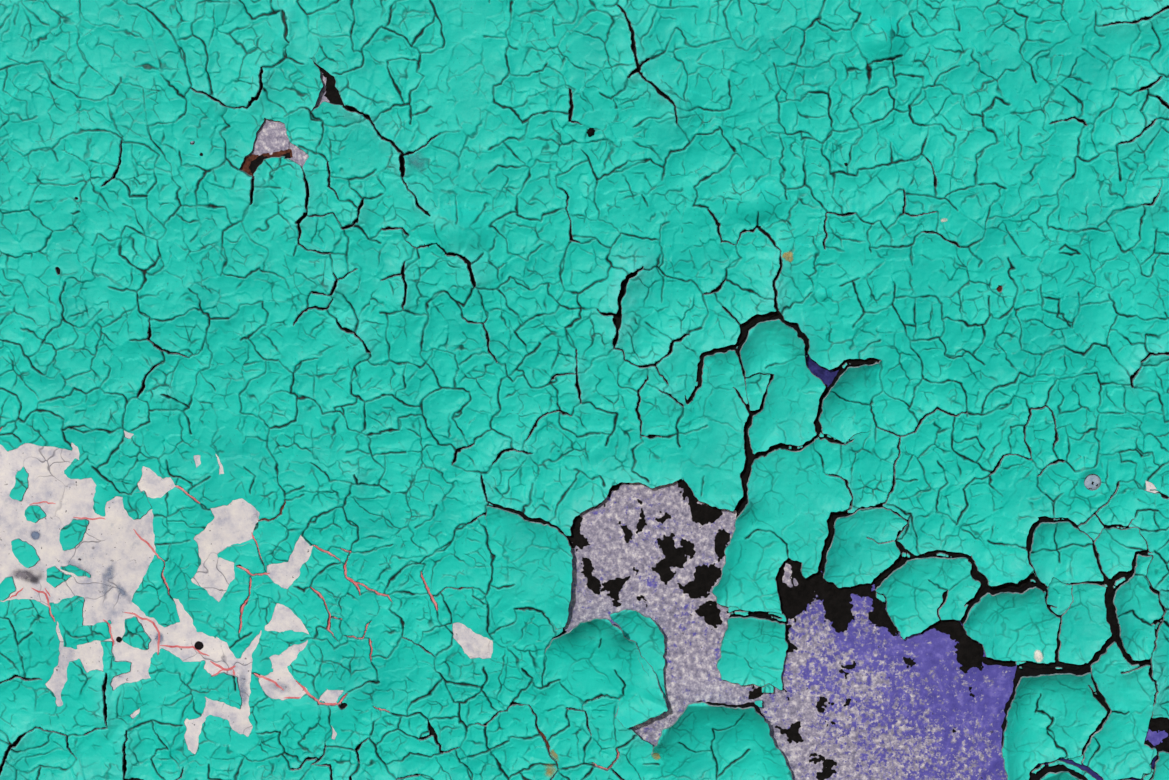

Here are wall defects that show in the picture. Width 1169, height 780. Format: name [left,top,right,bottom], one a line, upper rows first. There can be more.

peeling [240,118,309,179]
crack [294,106,476,352]
crack [618,6,677,123]
crack [0,673,143,780]
peeling [0,443,347,754]
crack [311,545,392,658]
peeling [453,622,493,659]
crack [452,349,581,532]
crack [598,209,879,493]
peeling [485,319,1169,780]
crack [818,407,967,573]
crack [867,481,1164,729]